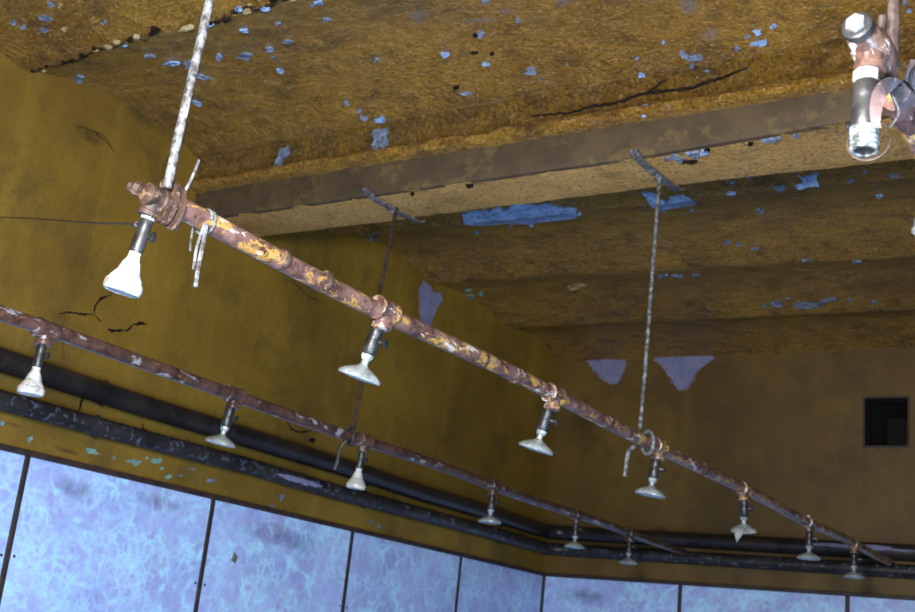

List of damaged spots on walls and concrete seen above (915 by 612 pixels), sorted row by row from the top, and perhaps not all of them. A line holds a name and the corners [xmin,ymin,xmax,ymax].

peeling [38,1,63,33]
peeling [143,54,213,80]
crack [530,68,749,117]
peeling [342,101,389,150]
peeling [462,203,581,234]
peeling [418,279,442,326]
crack [60,292,147,360]
peeling [586,359,627,385]
peeling [654,355,716,392]